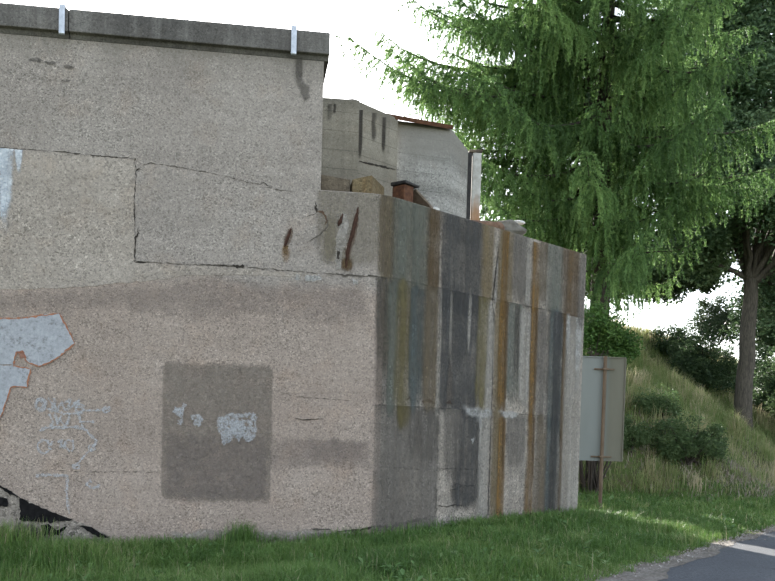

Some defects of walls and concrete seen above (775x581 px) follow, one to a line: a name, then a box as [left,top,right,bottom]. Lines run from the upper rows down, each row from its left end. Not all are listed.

leakage [297,59,309,100]
leakage [0,148,22,216]
crack [0,147,287,263]
crack [203,262,244,270]
crack [306,203,328,241]
spalling [335,207,359,270]
leakage [350,193,491,531]
corrosion [476,224,512,519]
corrosion [525,241,539,514]
leakage [507,234,584,514]
peeling [0,485,73,538]
peeling [80,525,108,538]